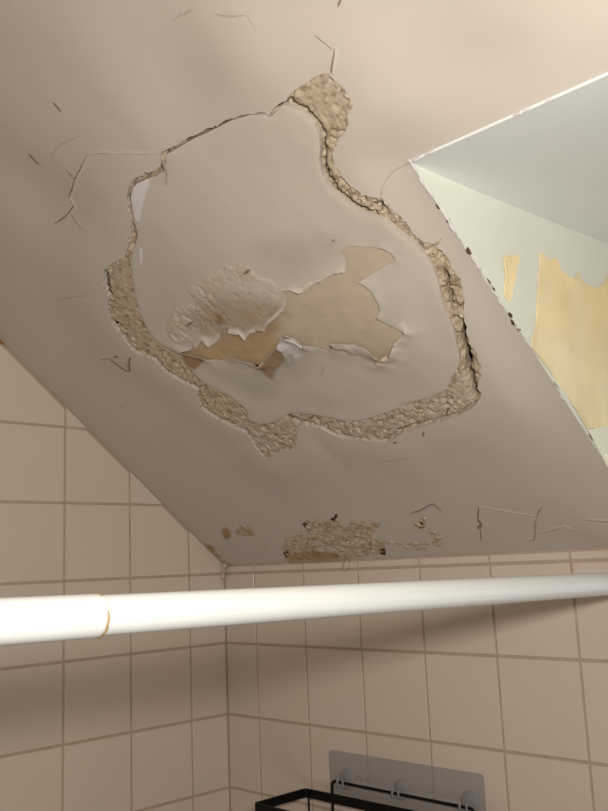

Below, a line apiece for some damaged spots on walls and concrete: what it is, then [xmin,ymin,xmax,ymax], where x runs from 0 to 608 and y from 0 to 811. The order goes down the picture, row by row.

crack [315,36,339,75]
crack [53,155,89,229]
spalling [105,73,481,457]
spalling [408,150,532,348]
leakage [181,354,203,369]
leakage [259,350,293,379]
spalling [283,514,443,570]
crack [477,504,608,541]